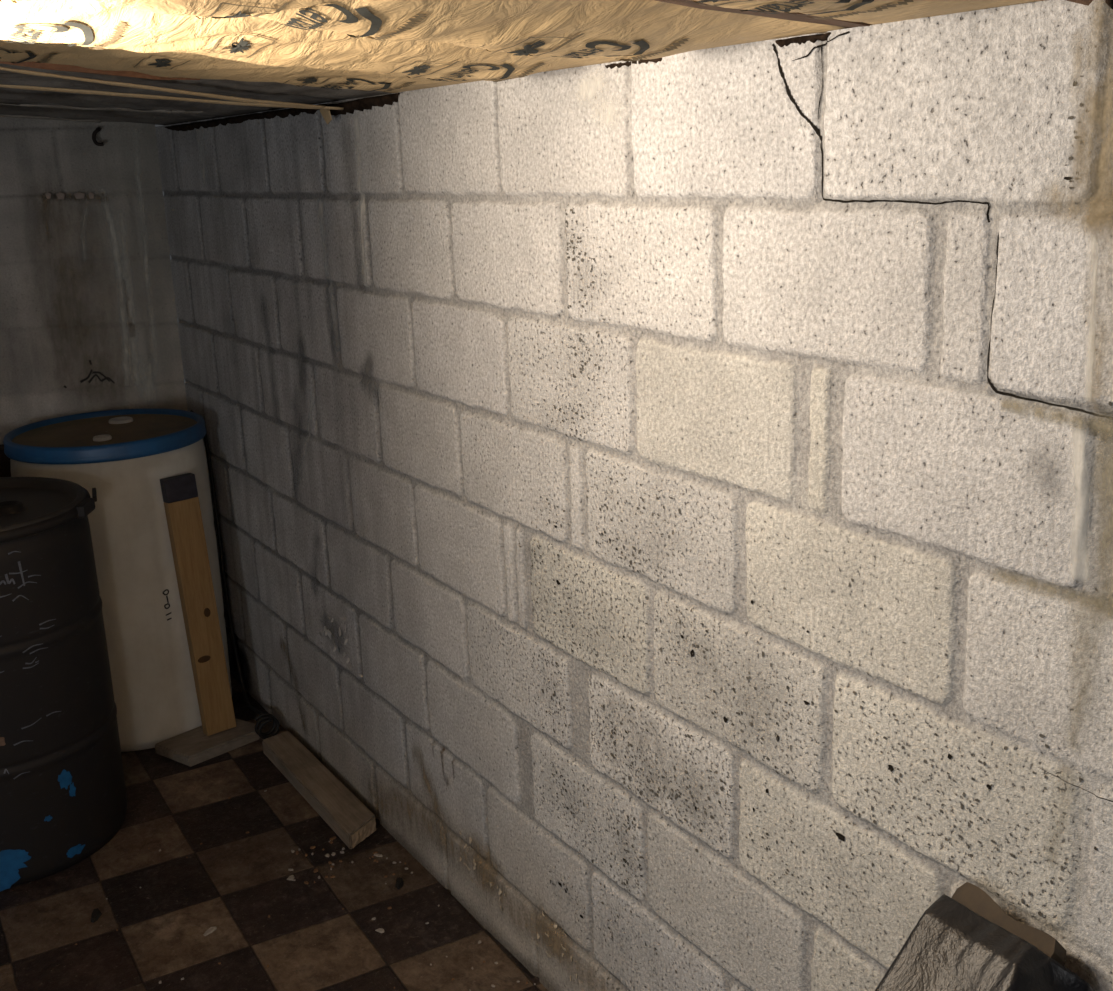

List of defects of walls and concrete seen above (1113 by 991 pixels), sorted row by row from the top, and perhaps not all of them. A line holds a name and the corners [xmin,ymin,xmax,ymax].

crack [772,31,1113,420]
damp [1072,69,1113,401]